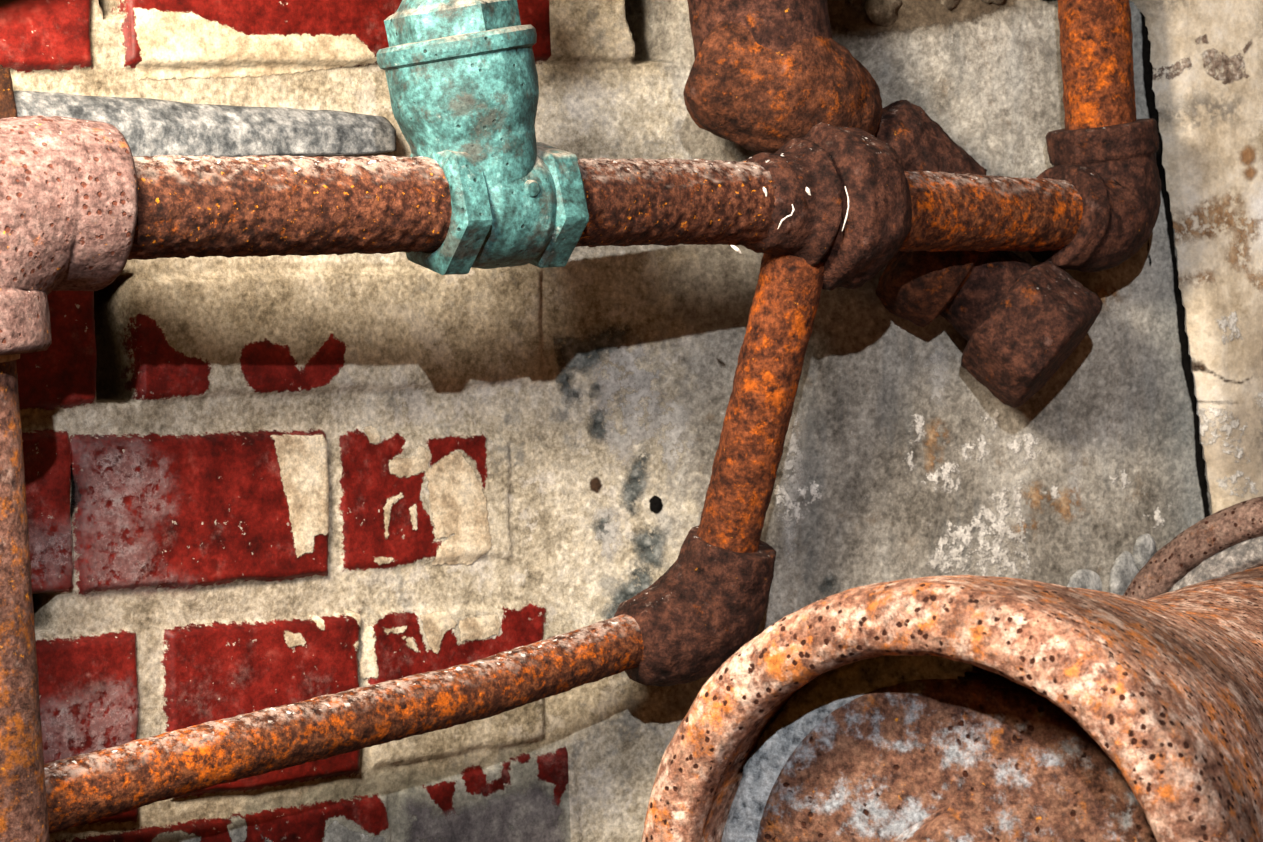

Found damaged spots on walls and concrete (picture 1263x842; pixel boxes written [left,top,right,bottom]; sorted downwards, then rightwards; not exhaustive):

peeling [133,7,377,80]
peeling [270,434,329,558]
peeling [152,830,201,842]
peeling [227,815,272,842]
peeling [324,820,386,842]